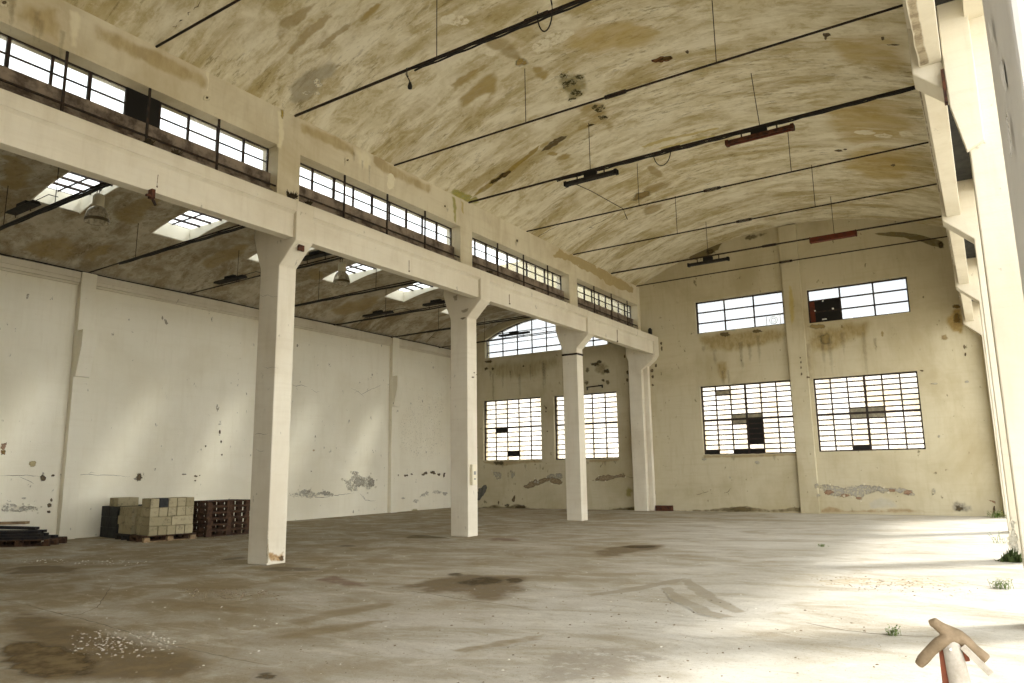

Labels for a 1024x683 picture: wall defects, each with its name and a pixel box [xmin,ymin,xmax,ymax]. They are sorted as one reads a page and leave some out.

leakage [448,17,670,224]
leakage [697,285,884,383]
peeling [0,497,52,514]
peeling [288,471,377,499]
spalling [477,470,563,505]
spalling [814,482,917,502]